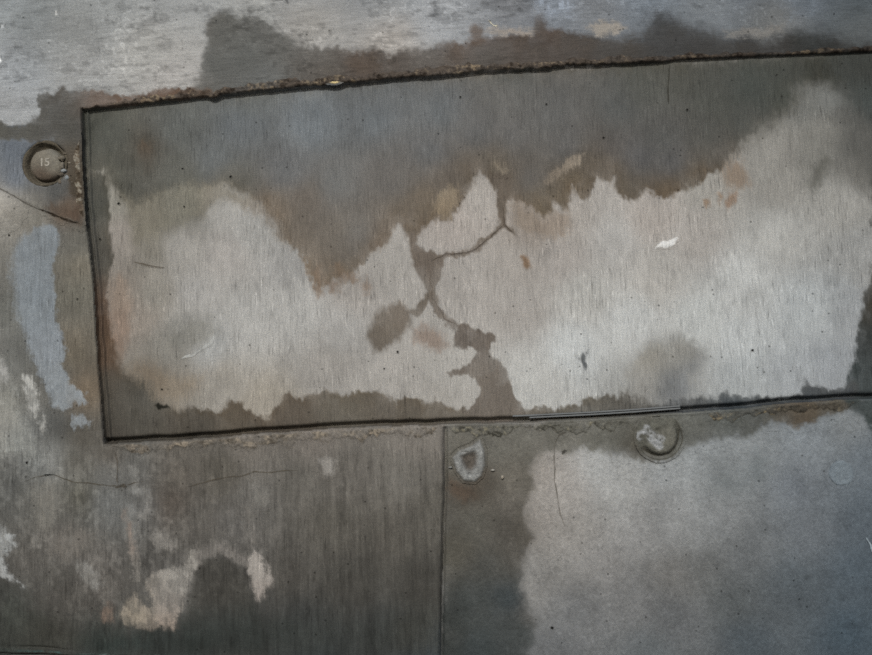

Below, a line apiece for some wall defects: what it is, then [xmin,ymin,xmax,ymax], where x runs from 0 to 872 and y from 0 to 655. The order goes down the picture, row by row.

water stain [0,167,558,655]
water stain [0,0,872,472]